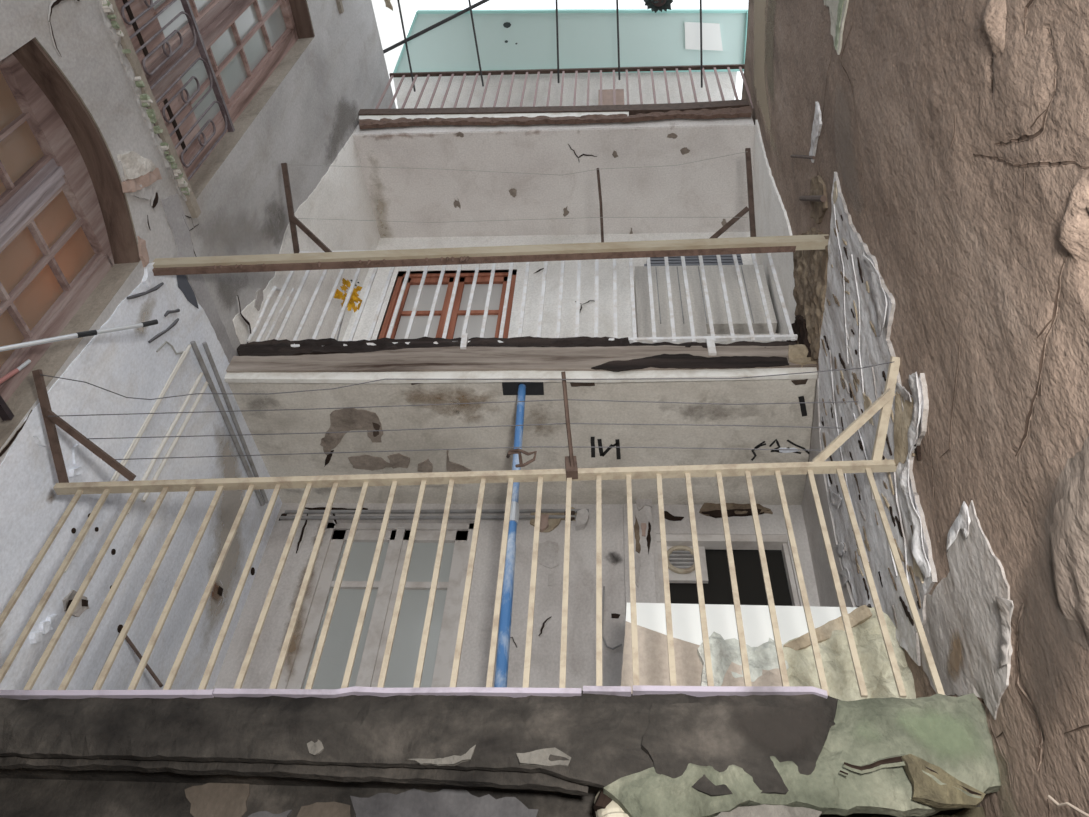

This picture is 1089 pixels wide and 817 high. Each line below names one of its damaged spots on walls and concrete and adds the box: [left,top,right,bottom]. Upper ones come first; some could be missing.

crack [48,0,81,57]
crack [973,0,1089,192]
crack [568,143,597,163]
crack [1015,253,1068,457]
crack [0,409,32,457]
peeling [320,408,383,467]
peeling [348,453,433,472]
flaking render [407,745,476,766]
flaking render [516,748,571,767]
peeling [184,783,539,817]
flaking render [715,804,822,817]
flaking render [901,754,986,817]